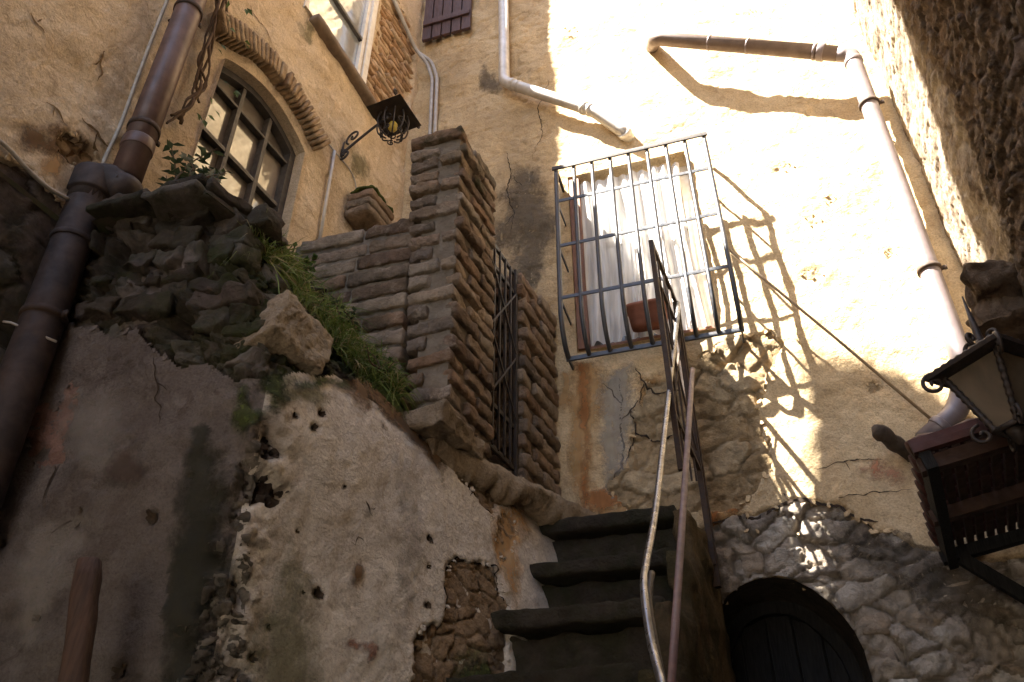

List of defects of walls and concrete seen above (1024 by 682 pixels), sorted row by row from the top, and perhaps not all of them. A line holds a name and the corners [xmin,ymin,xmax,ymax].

water stain [480,70,500,90]
water stain [494,170,555,287]
crack [504,81,549,229]
water stain [162,534,218,663]
flaking render [176,435,290,682]
flaking render [411,478,518,682]
rust [559,362,630,514]
crack [602,368,678,478]
flaking render [607,327,1024,682]
crack [814,458,880,470]